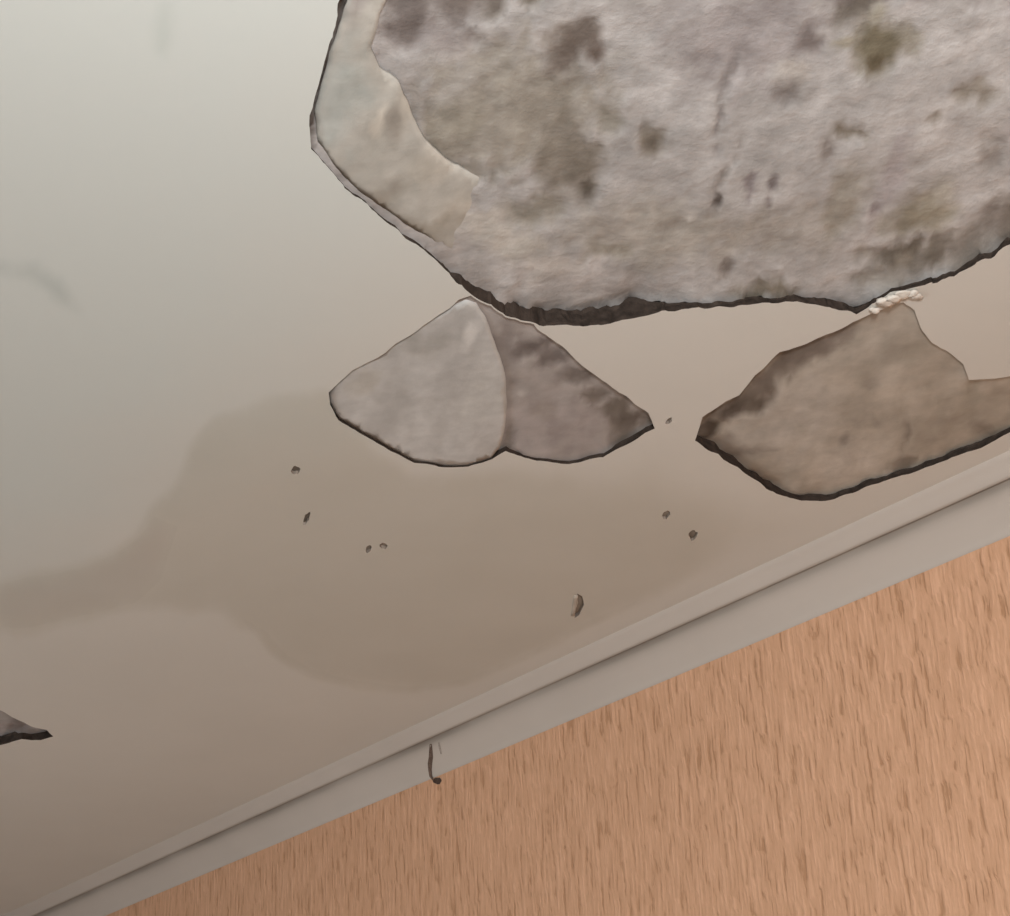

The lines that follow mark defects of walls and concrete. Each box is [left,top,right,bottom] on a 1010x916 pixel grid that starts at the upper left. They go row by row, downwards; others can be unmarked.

spalling [309,0,1010,501]
spalling [0,711,53,745]